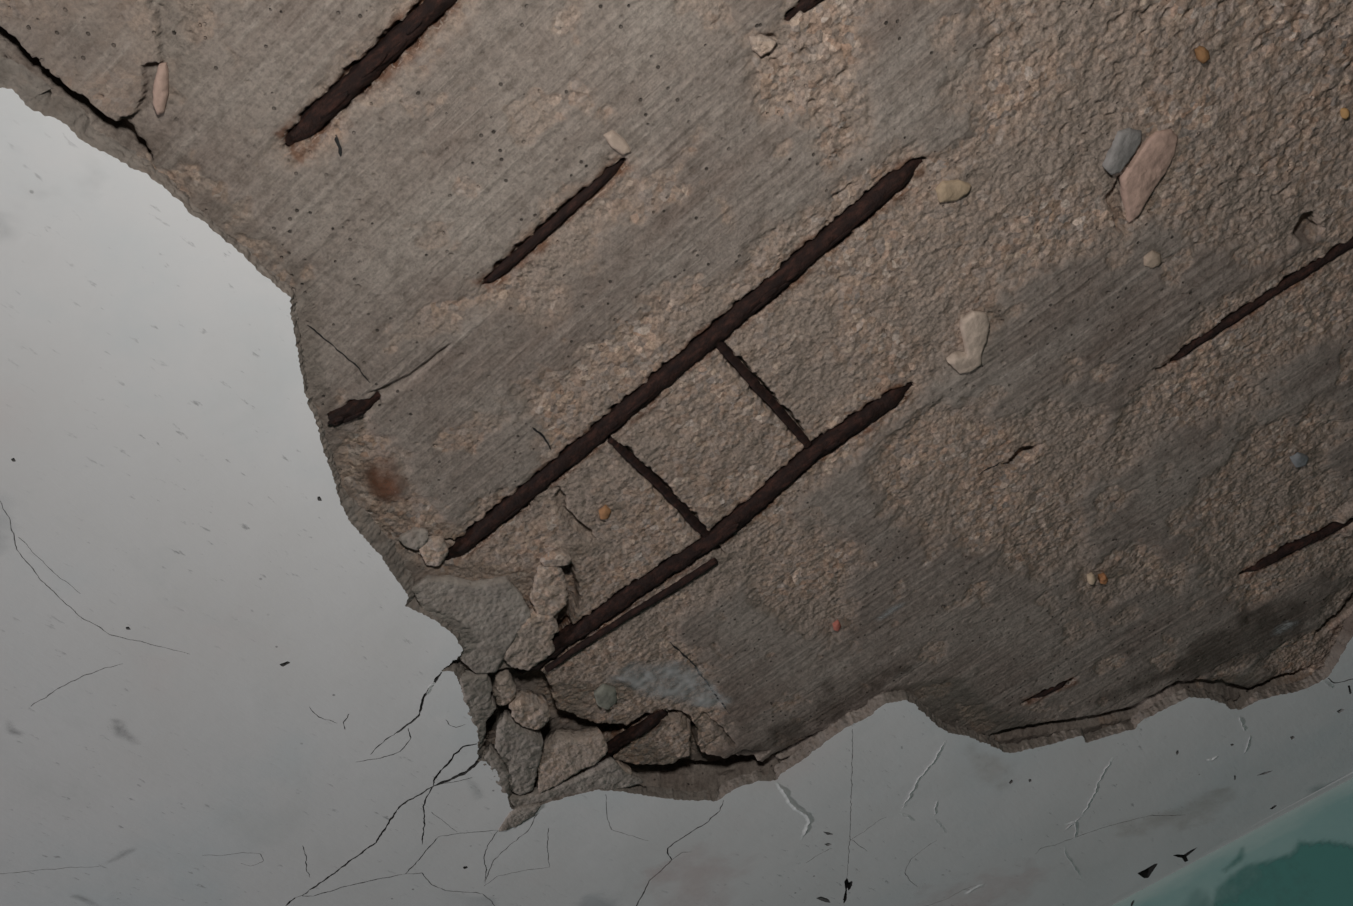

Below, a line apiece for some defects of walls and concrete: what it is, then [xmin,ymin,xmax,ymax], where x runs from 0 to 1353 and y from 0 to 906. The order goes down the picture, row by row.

spalling [0,0,1006,766]
spalling [540,0,1353,805]
crack [0,501,188,706]
crack [670,642,729,713]
crack [286,672,550,906]
crack [606,797,724,906]
crack [806,729,883,874]